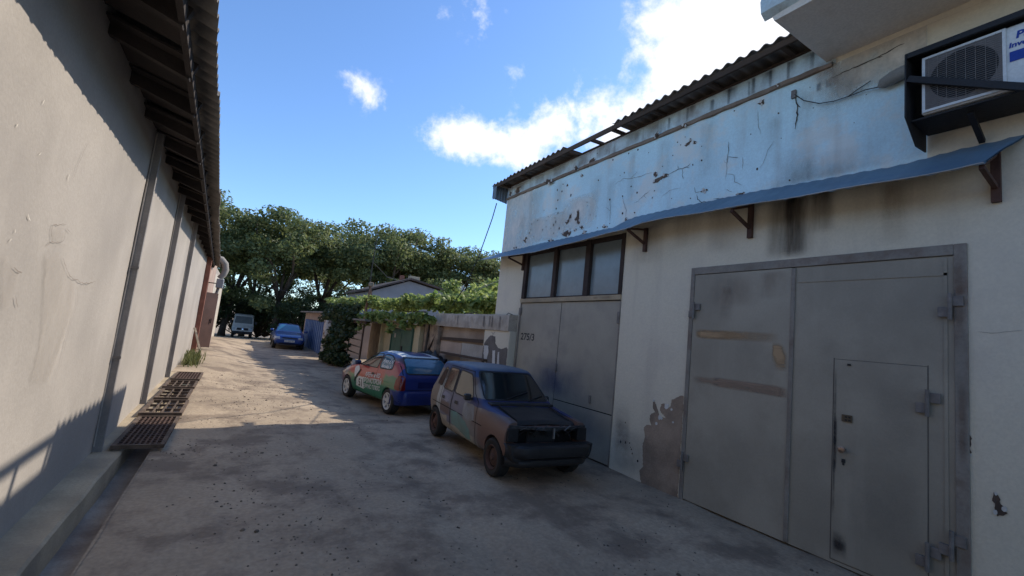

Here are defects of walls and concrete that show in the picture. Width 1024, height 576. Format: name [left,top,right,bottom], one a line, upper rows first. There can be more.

crack [607,126,774,218]
peeling [513,179,610,249]
corrosion [699,378,783,396]
flaking render [620,396,684,497]
flaking render [992,492,1007,516]